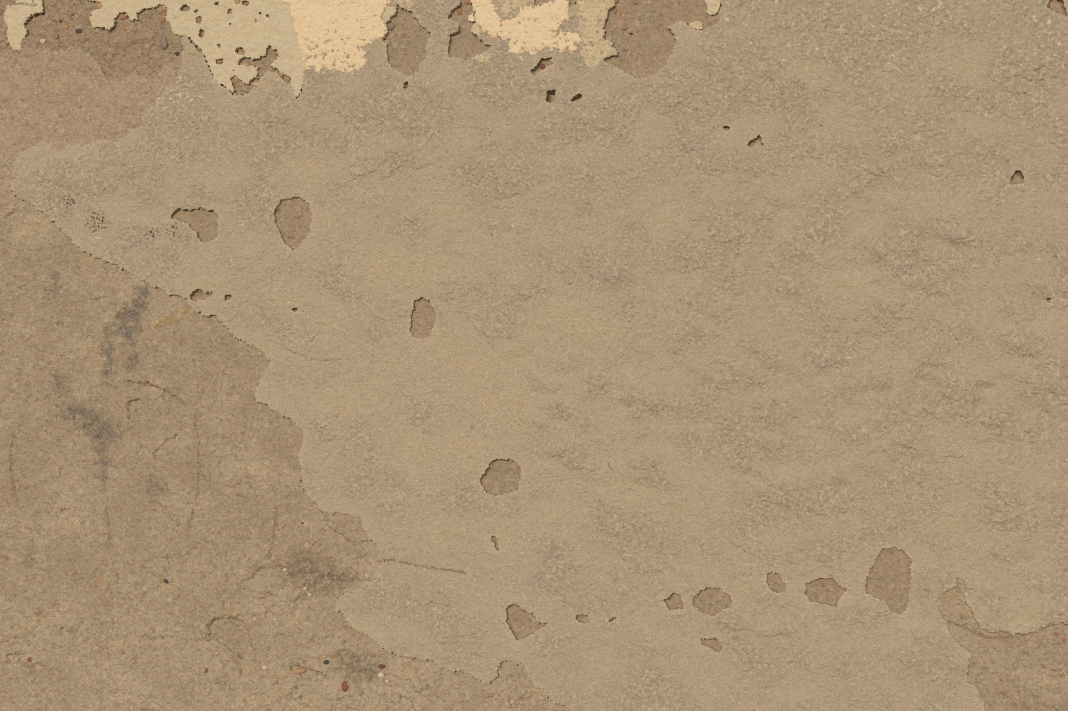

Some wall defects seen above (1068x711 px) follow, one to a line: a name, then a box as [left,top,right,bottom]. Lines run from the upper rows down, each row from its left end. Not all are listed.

spalling [448,0,722,79]
spalling [748,135,764,147]
spalling [1010,171,1024,185]
spalling [0,0,571,711]
spalling [664,587,732,616]
spalling [767,572,786,593]
spalling [805,578,847,606]
spalling [865,547,912,613]
spalling [701,638,722,652]
spalling [938,578,1068,711]